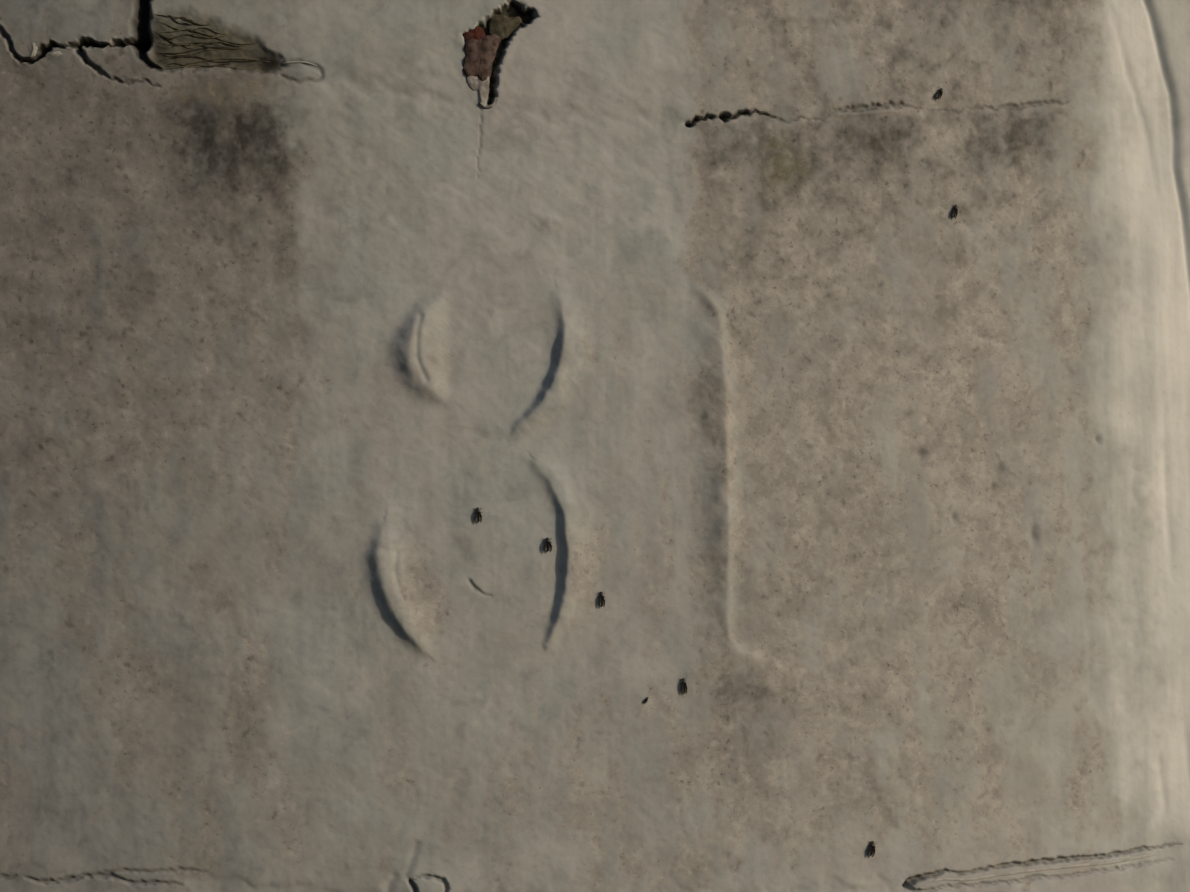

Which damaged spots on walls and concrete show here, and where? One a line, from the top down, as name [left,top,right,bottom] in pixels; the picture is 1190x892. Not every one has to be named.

crack [0,0,161,89]
spalling [147,4,325,84]
spalling [461,0,541,108]
crack [683,98,1071,129]
crack [0,866,207,888]
crack [406,873,450,892]
crack [900,842,1182,892]